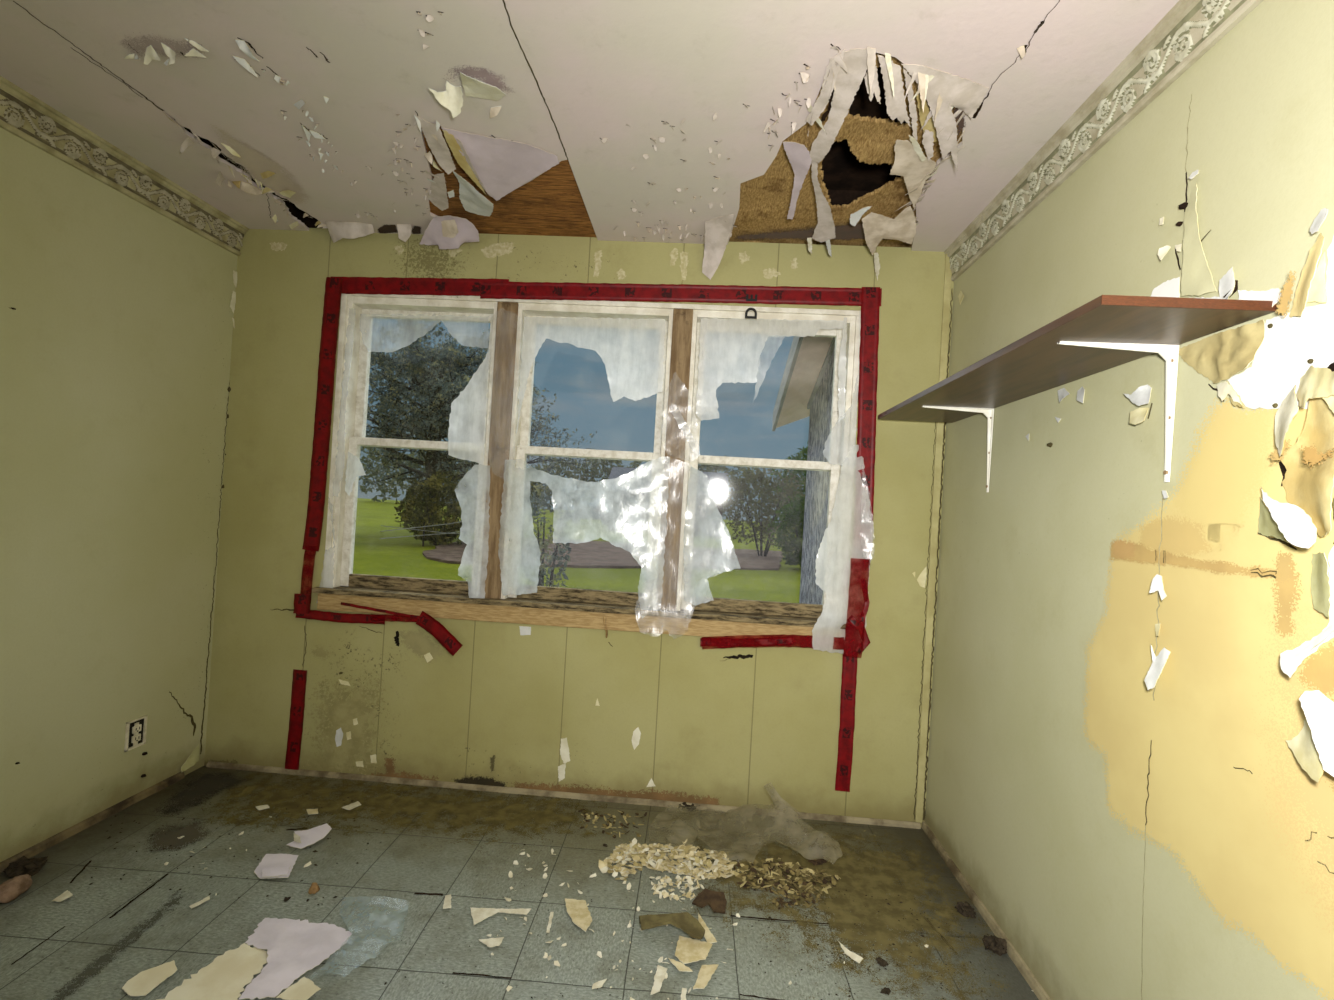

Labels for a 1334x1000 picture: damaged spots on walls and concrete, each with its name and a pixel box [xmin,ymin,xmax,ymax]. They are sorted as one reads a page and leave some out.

crack [13,1,327,229]
peeling [325,114,441,255]
crack [502,0,568,160]
spalling [821,139,901,206]
spalling [849,67,909,124]
crack [972,0,1060,118]
crack [1157,94,1217,296]
peeling [1151,236,1334,409]
peeling [1124,384,1153,425]
crack [1144,490,1170,700]
peeling [1303,546,1334,660]
crack [1142,740,1152,940]